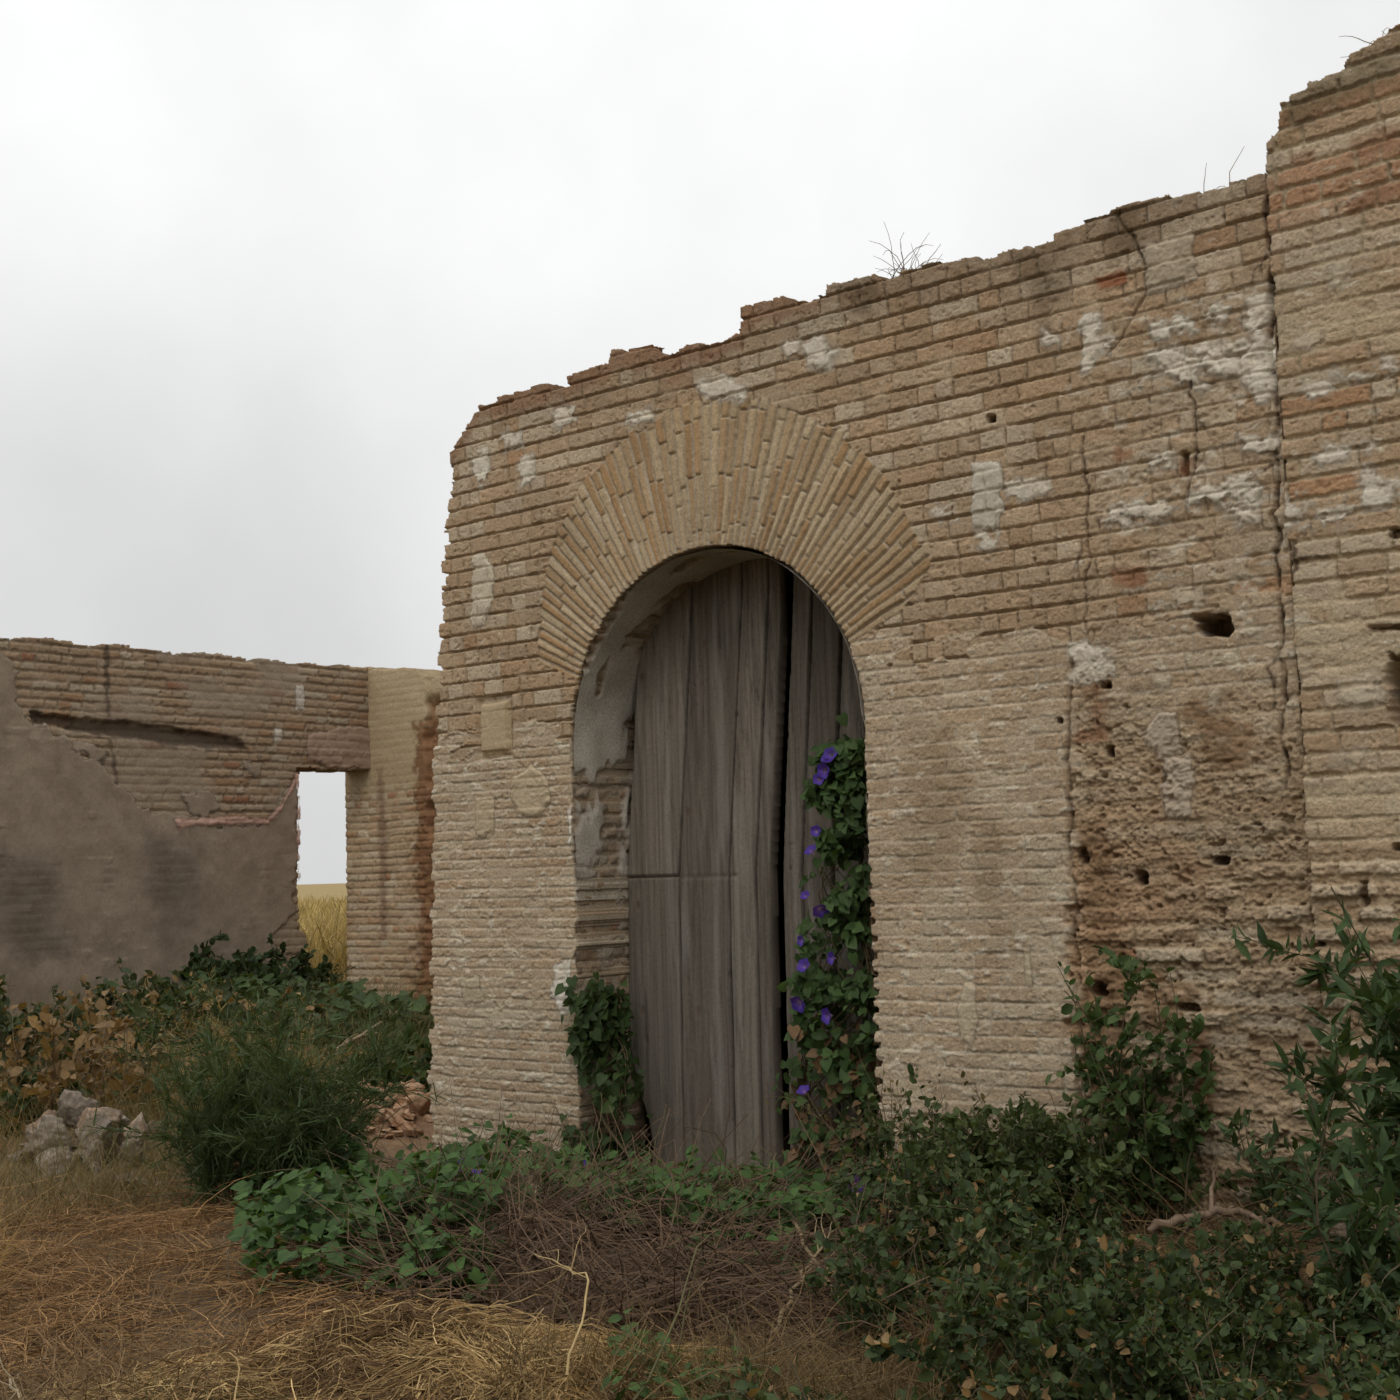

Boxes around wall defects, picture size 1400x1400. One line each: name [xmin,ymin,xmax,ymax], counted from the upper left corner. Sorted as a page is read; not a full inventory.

crack [1252,199,1277,337]
peeling [1169,582,1208,609]
crack [1264,453,1321,775]
peeling [1067,638,1116,685]
peeling [306,725,371,770]
peeling [1160,754,1195,819]
peeling [0,653,299,1017]
spalling [550,959,571,1015]